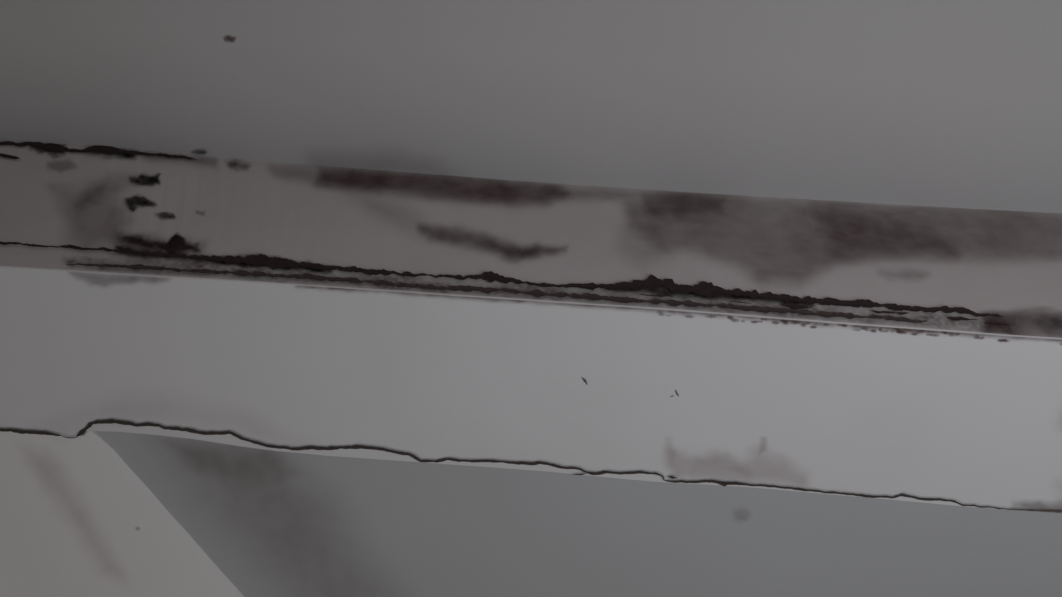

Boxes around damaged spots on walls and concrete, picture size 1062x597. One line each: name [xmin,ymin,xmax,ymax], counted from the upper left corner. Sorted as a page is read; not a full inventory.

mould [126,174,175,218]
mould [116,234,198,258]
water stain [478,240,554,257]
water stain [862,315,1028,338]
crack [0,419,1062,513]